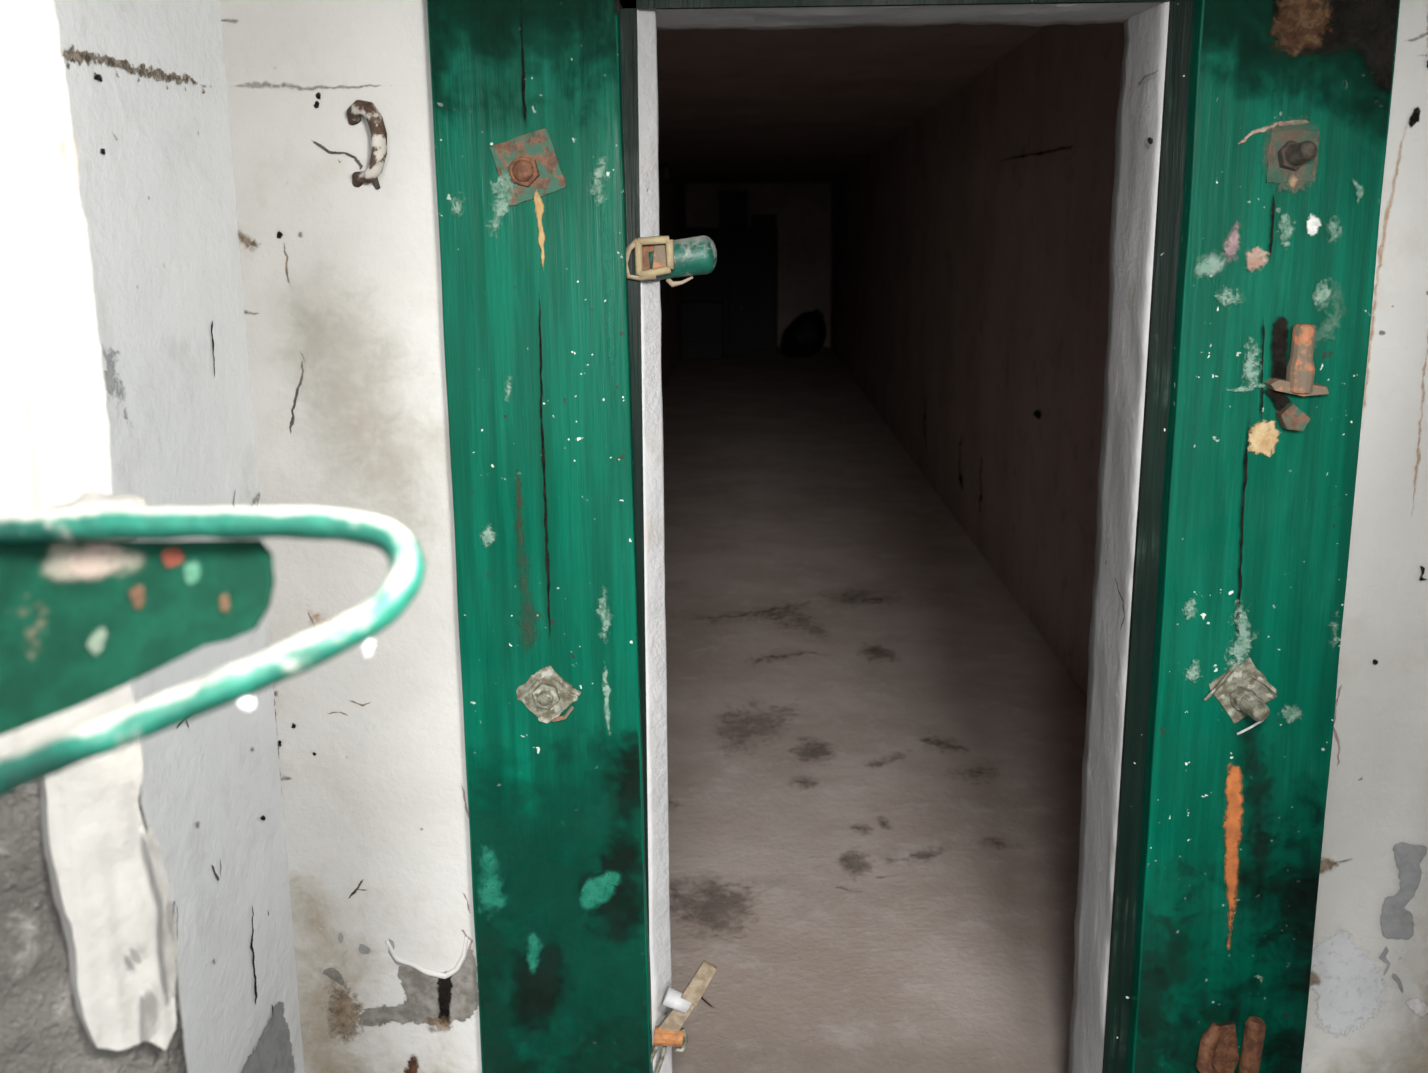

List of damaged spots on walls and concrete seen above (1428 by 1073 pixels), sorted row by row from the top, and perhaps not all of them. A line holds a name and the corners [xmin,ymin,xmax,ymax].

corrosion [1271,0,1333,56]
crack [60,45,211,93]
peeling [1309,842,1428,1037]
spalling [323,968,344,985]
spalling [360,930,479,1032]